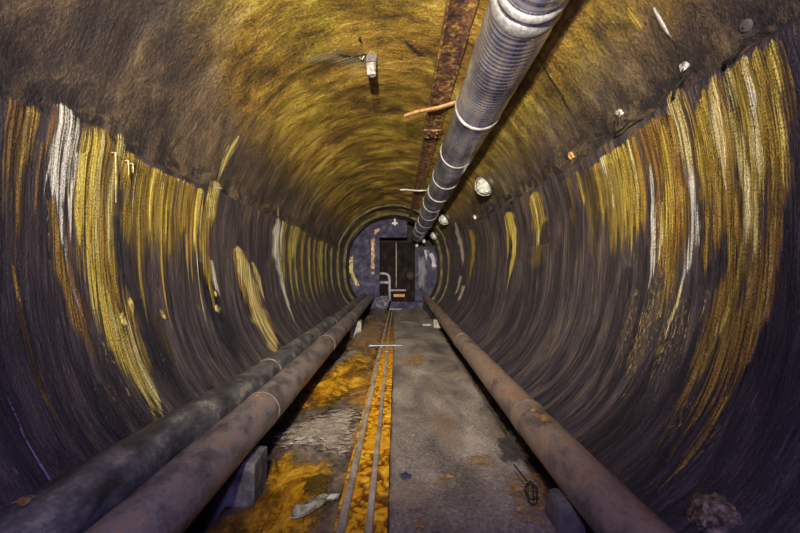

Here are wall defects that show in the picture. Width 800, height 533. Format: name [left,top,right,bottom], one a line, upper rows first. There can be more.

water stain [44,104,242,419]
water stain [232,246,278,352]
water stain [504,212,517,285]
water stain [529,192,549,285]
water stain [567,137,647,275]
water stain [658,39,796,336]